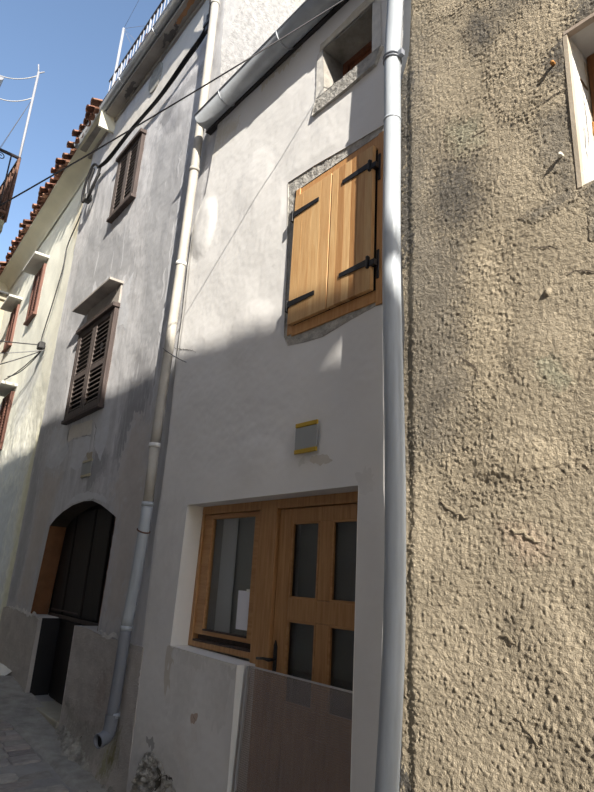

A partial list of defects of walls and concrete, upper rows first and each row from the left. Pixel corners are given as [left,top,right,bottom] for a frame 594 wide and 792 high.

leakage [401,0,539,488]
leakage [518,0,594,241]